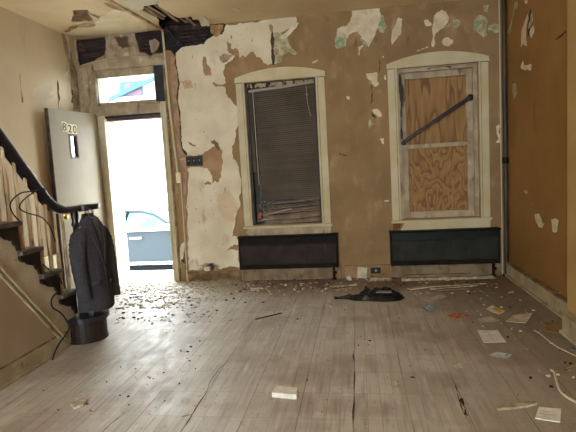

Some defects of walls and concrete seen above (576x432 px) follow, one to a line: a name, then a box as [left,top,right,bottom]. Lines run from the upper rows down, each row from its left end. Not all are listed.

peeling [335,8,402,55]
peeling [417,10,460,51]
peeling [474,5,499,37]
peeling [521,0,534,47]
peeling [366,72,386,95]
peeling [61,10,299,270]
crack [349,353,357,421]